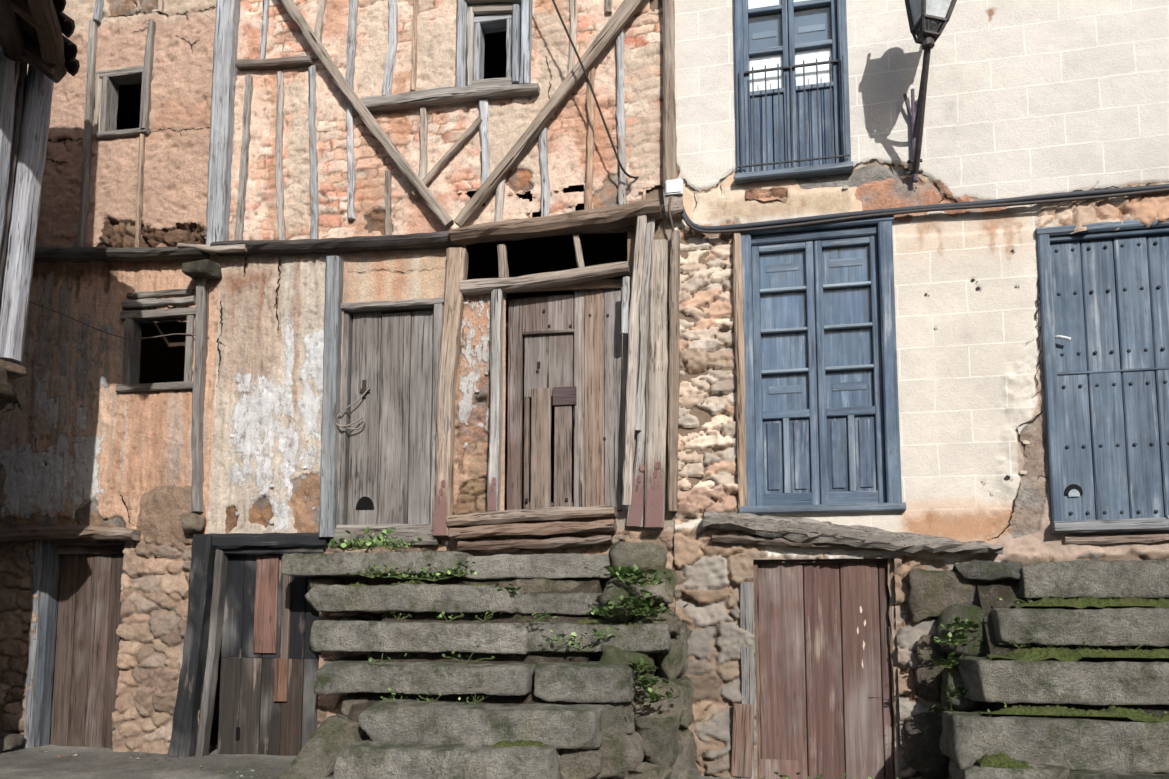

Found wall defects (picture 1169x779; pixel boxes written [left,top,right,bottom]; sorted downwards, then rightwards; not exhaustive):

peeling [0,317,126,528]
spalling [99,216,206,248]
spalling [123,305,188,323]
peeling [225,318,324,533]
peeling [433,294,497,535]
spalling [745,164,1005,222]
crack [984,279,1048,541]